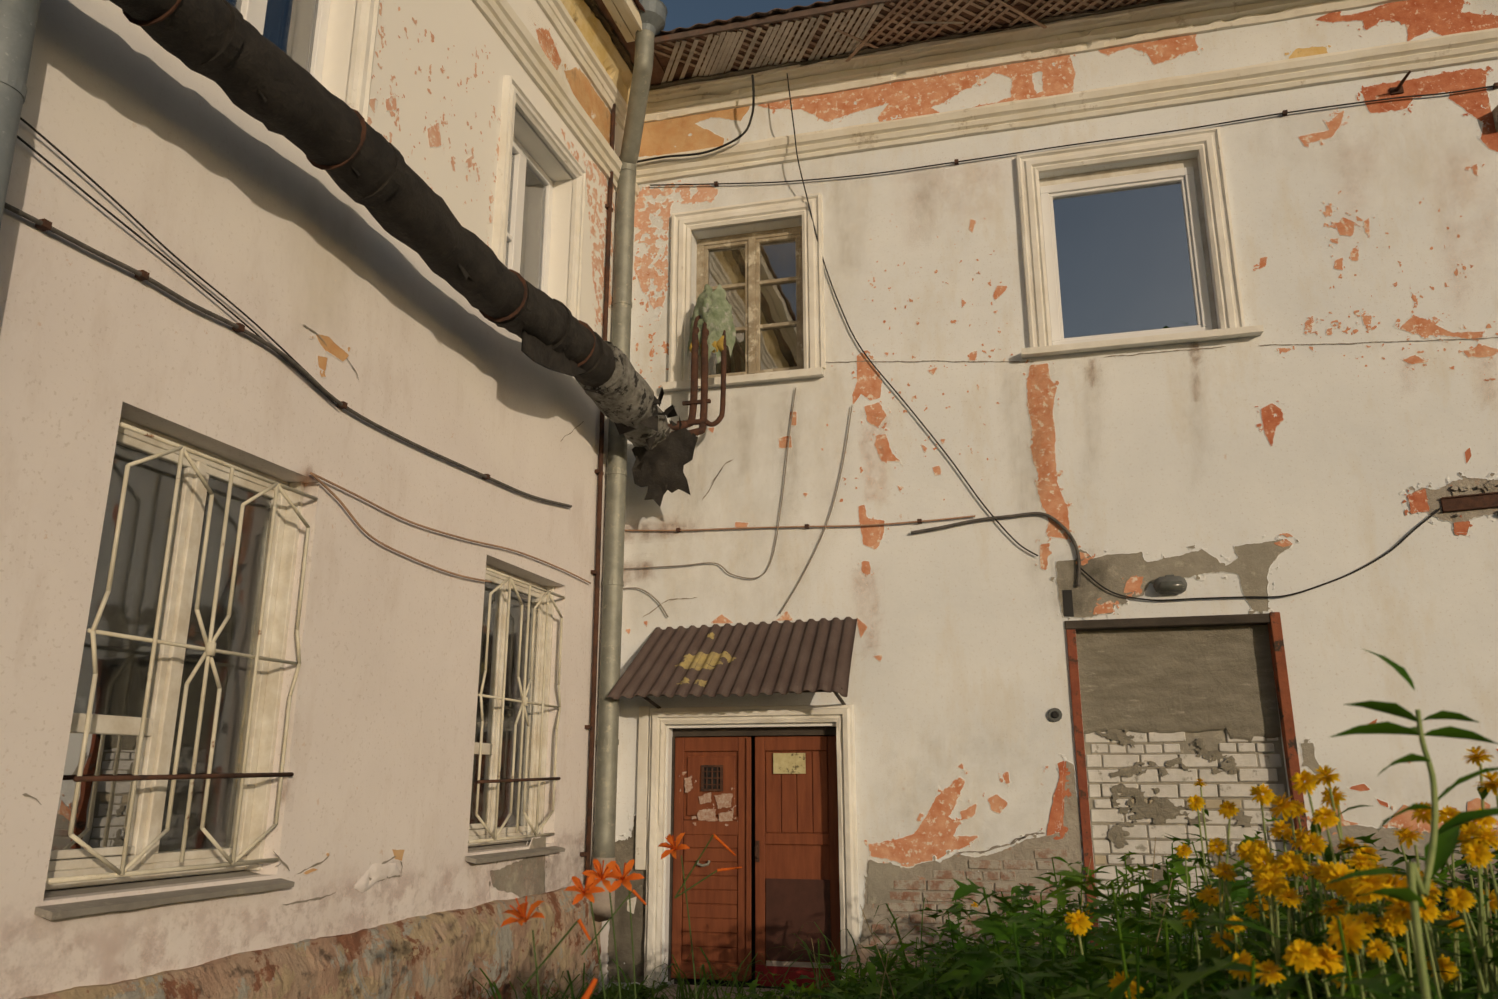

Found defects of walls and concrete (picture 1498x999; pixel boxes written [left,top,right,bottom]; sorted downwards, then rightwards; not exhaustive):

peeling [639,54,1081,158]
peeling [1096,34,1204,66]
peeling [1297,63,1498,176]
peeling [1313,0,1498,41]
peeling [560,126,615,335]
peeling [633,179,726,388]
peeling [1274,191,1498,381]
peeling [851,349,927,492]
spalling [912,251,1300,620]
spalling [1399,446,1498,539]
spalling [859,753,1102,953]
spalling [1296,736,1498,922]